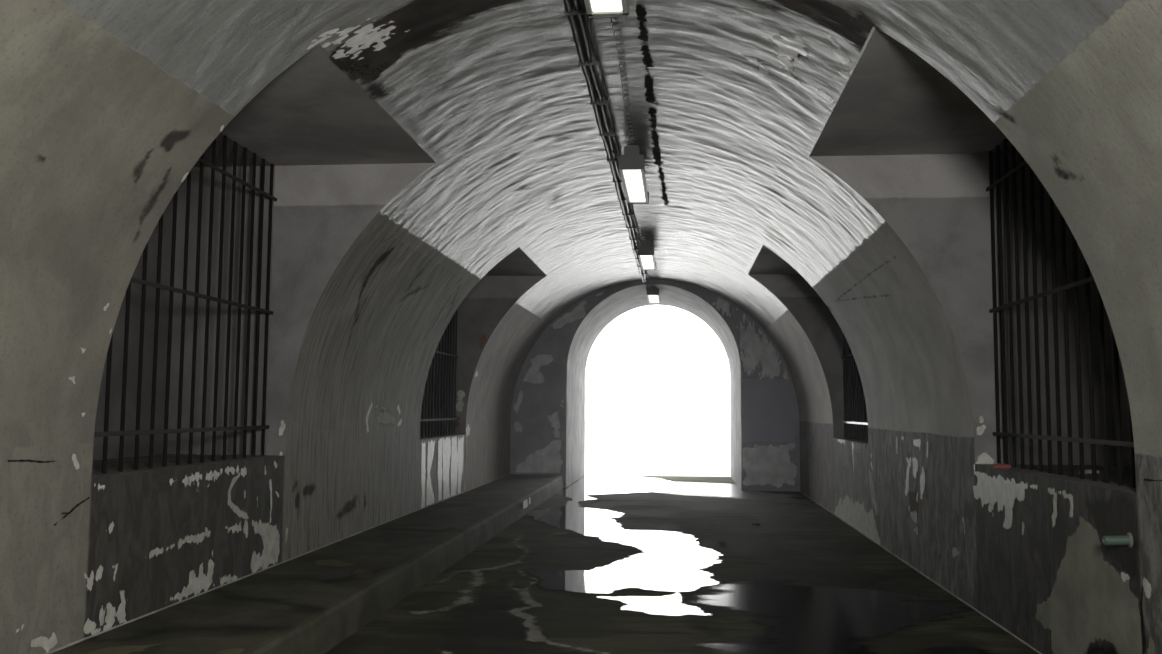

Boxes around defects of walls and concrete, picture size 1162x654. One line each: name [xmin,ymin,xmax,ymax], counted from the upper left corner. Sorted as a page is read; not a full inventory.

peeling [976,415,986,436]
peeling [169,465,247,492]
peeling [225,452,288,573]
peeling [743,442,797,489]
peeling [905,457,925,535]
peeling [84,563,127,635]
peeling [145,527,237,602]
flaking render [973,452,1155,654]